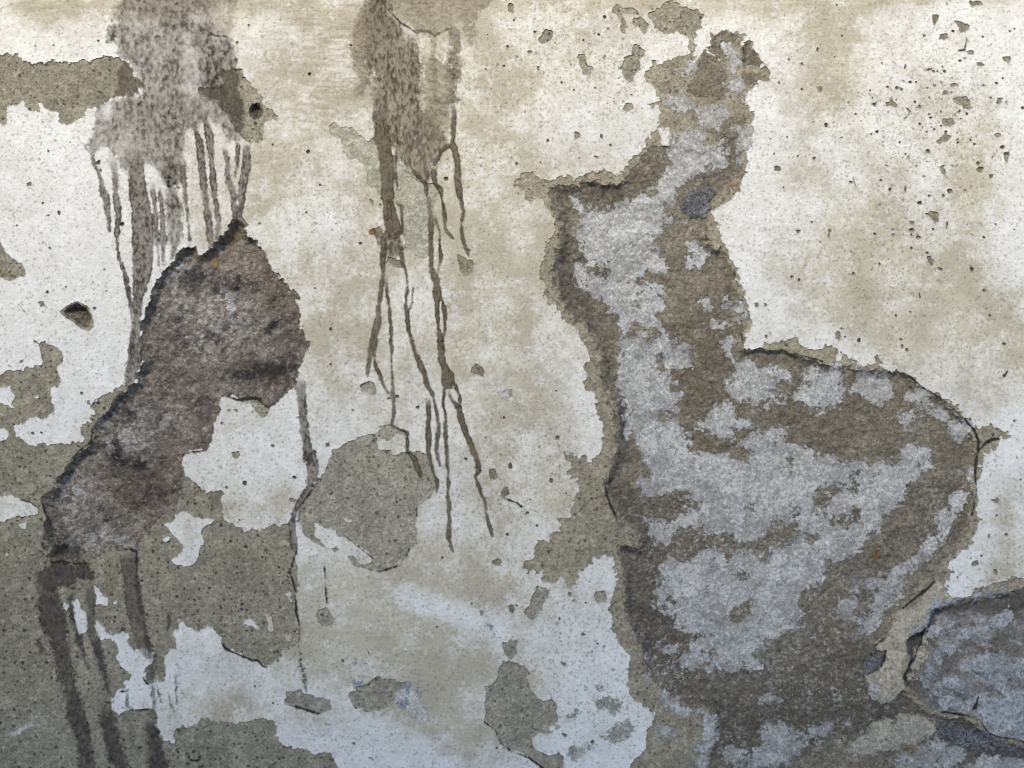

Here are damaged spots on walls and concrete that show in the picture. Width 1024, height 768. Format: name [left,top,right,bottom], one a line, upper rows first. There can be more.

peeling [0,52,142,125]
water stain [85,0,251,389]
water stain [350,0,493,552]
flaking render [484,0,1024,768]
water stain [35,562,130,768]
water stain [120,560,177,711]
water stain [143,725,168,768]
peeling [0,219,436,768]
crack [290,550,300,625]